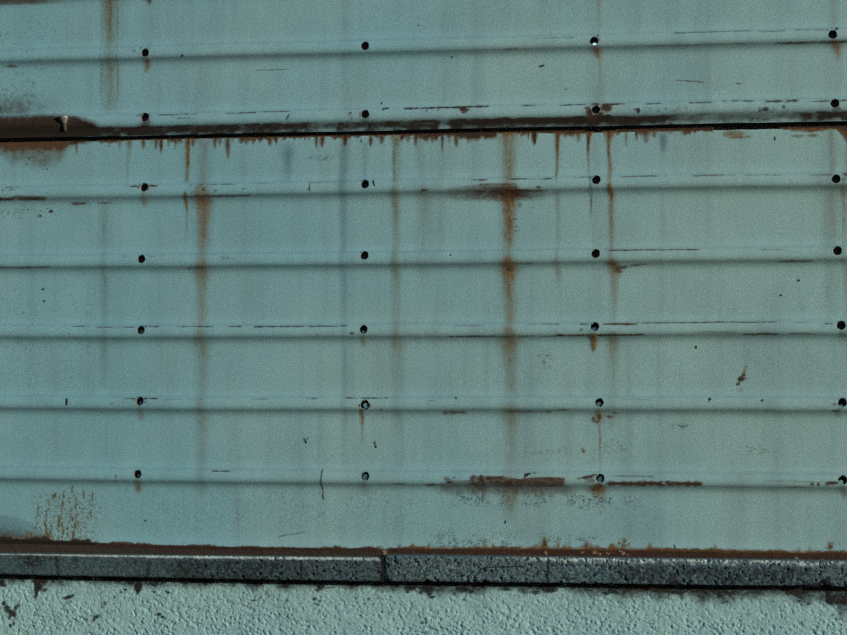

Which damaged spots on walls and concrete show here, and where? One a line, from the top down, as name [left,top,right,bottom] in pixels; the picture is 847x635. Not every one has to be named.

corrosion [585,103,616,118]
corrosion [0,115,125,161]
corrosion [135,138,203,178]
corrosion [604,127,713,170]
corrosion [780,126,847,140]
corrosion [214,130,593,243]
corrosion [185,188,210,242]
corrosion [503,257,516,305]
corrosion [462,475,565,494]
corrosion [578,474,605,495]
corrosion [0,487,847,560]